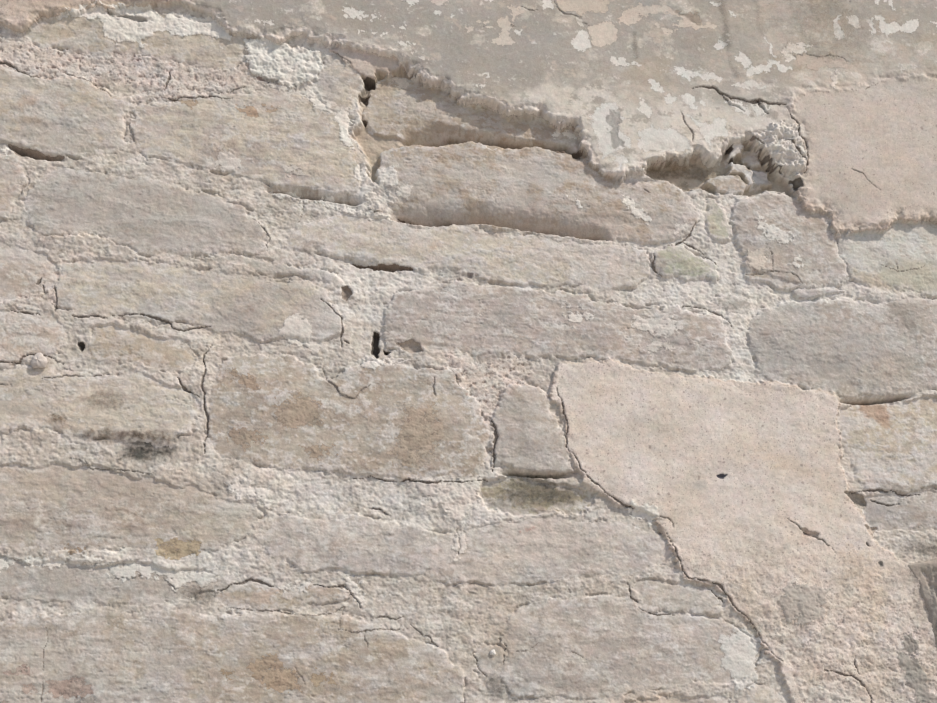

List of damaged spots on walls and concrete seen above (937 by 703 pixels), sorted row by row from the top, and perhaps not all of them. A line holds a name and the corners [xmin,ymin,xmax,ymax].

peeling [833,0,919,40]
spalling [211,0,753,175]
peeling [724,99,771,117]
crack [693,86,809,174]
peeling [673,36,849,91]
crack [11,278,211,332]
crack [0,354,102,385]
crack [177,352,209,454]
crack [561,399,633,509]
crack [629,586,675,616]
crack [660,516,778,659]